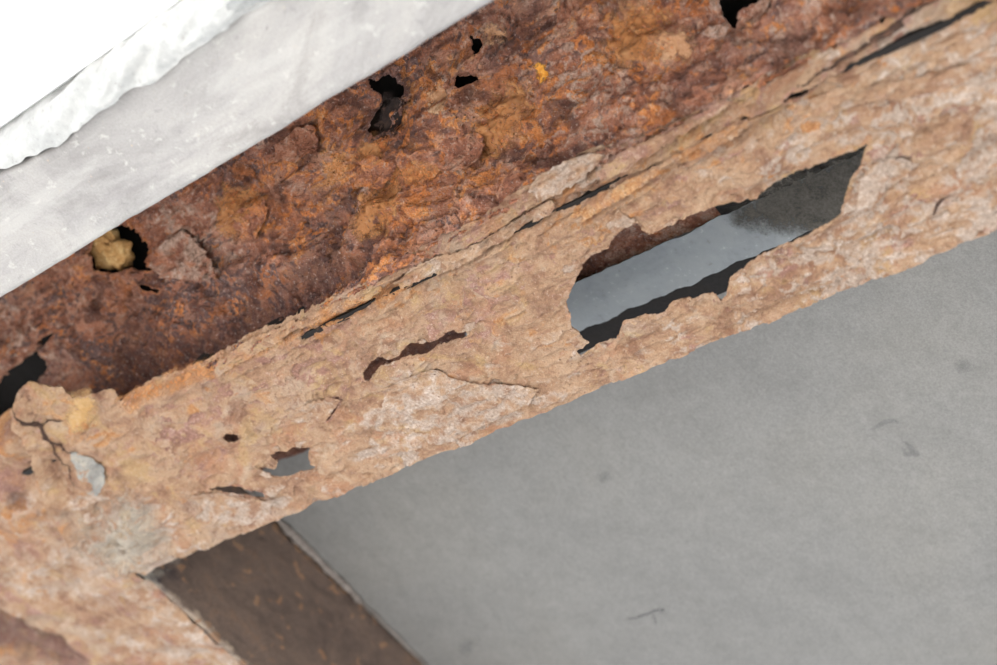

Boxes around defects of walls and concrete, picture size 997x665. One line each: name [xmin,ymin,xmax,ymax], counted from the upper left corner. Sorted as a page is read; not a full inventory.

rust [534,62,549,83]
rust [606,3,696,70]
peeling [232,199,270,245]
peeling [274,125,319,163]
peeling [352,154,397,190]
rust [357,93,405,165]
rust [351,162,440,241]
rust [475,82,534,158]
peeling [393,98,786,290]
peeling [215,285,383,377]
peeling [590,343,607,352]
crack [12,410,77,487]